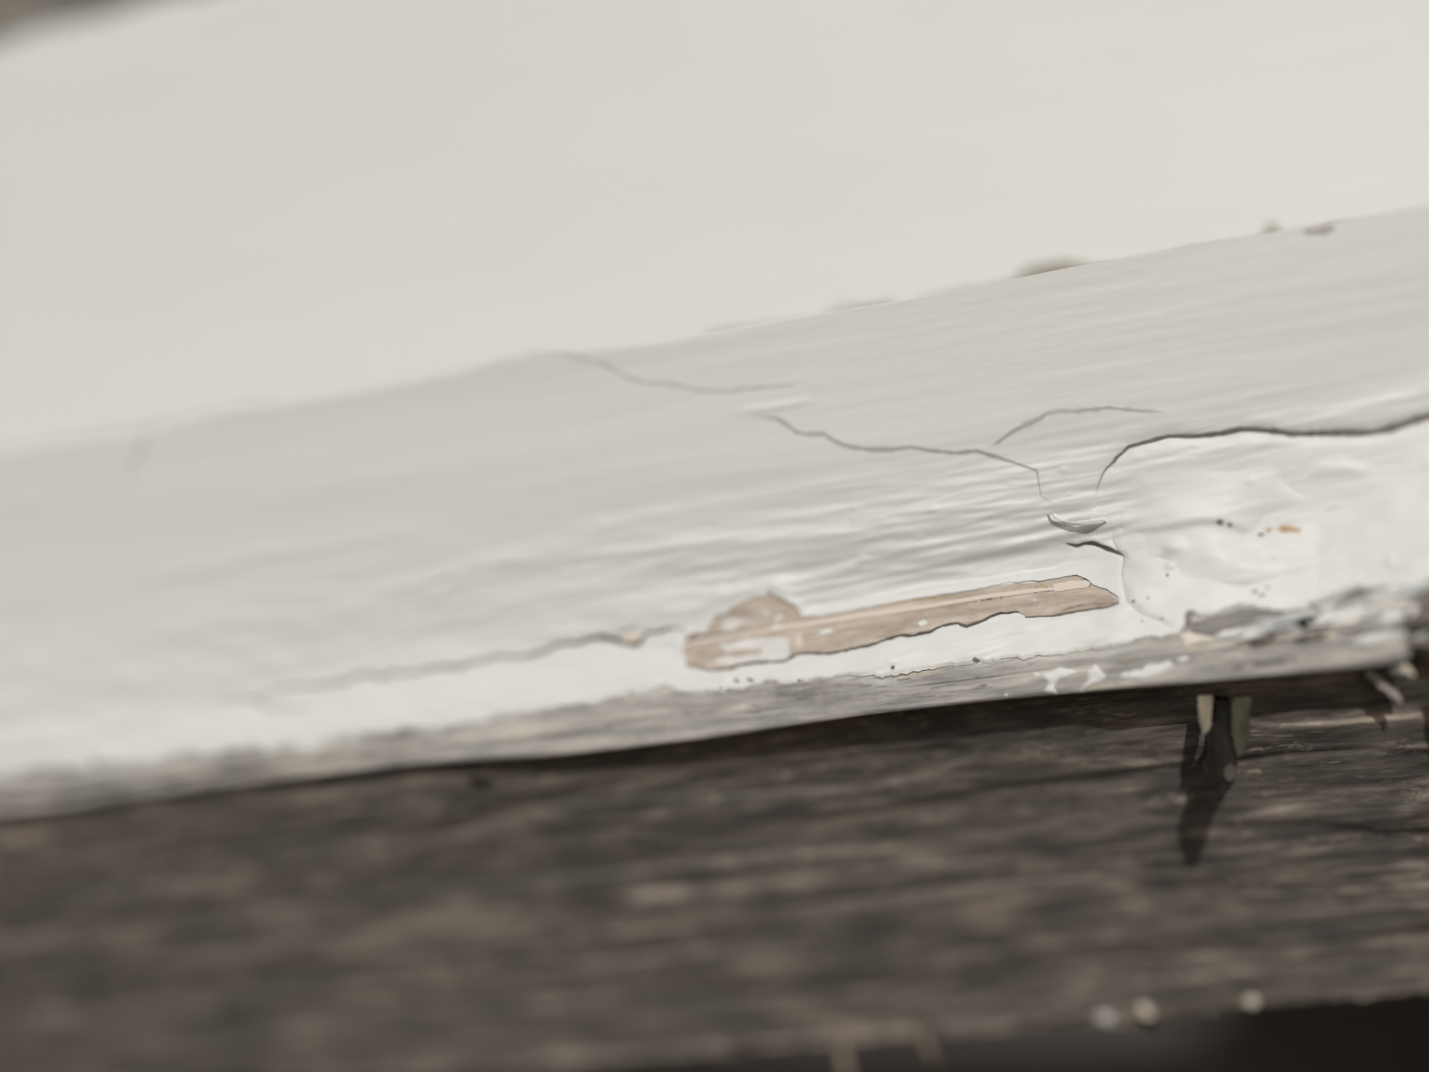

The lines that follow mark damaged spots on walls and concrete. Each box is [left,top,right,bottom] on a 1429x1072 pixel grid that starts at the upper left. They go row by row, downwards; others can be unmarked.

crack [771,407,1429,622]
peeling [673,559,1135,683]
peeling [1185,586,1284,636]
crack [210,622,685,710]
peeling [1033,656,1189,695]